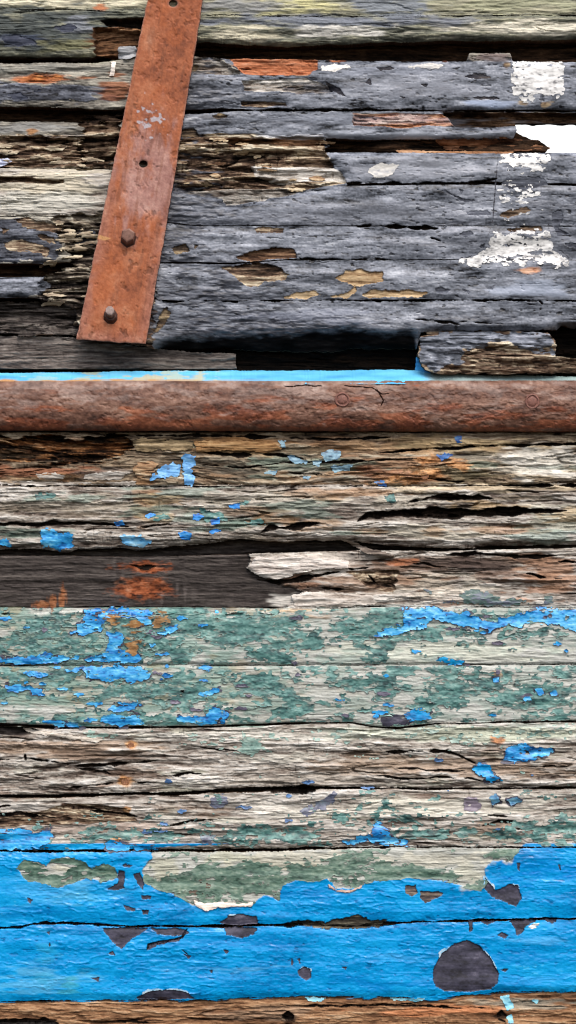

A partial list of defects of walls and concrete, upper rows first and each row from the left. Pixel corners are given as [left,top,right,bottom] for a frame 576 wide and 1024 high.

peeling [511,61,565,103]
peeling [437,153,576,269]
peeling [150,454,196,487]
crack [358,479,576,522]
peeling [40,527,74,552]
rust [30,580,69,615]
rust [95,558,182,656]
peeling [0,589,576,938]
crack [379,749,480,781]
crack [0,921,116,929]
peeling [103,927,189,955]
peeling [433,919,556,1024]